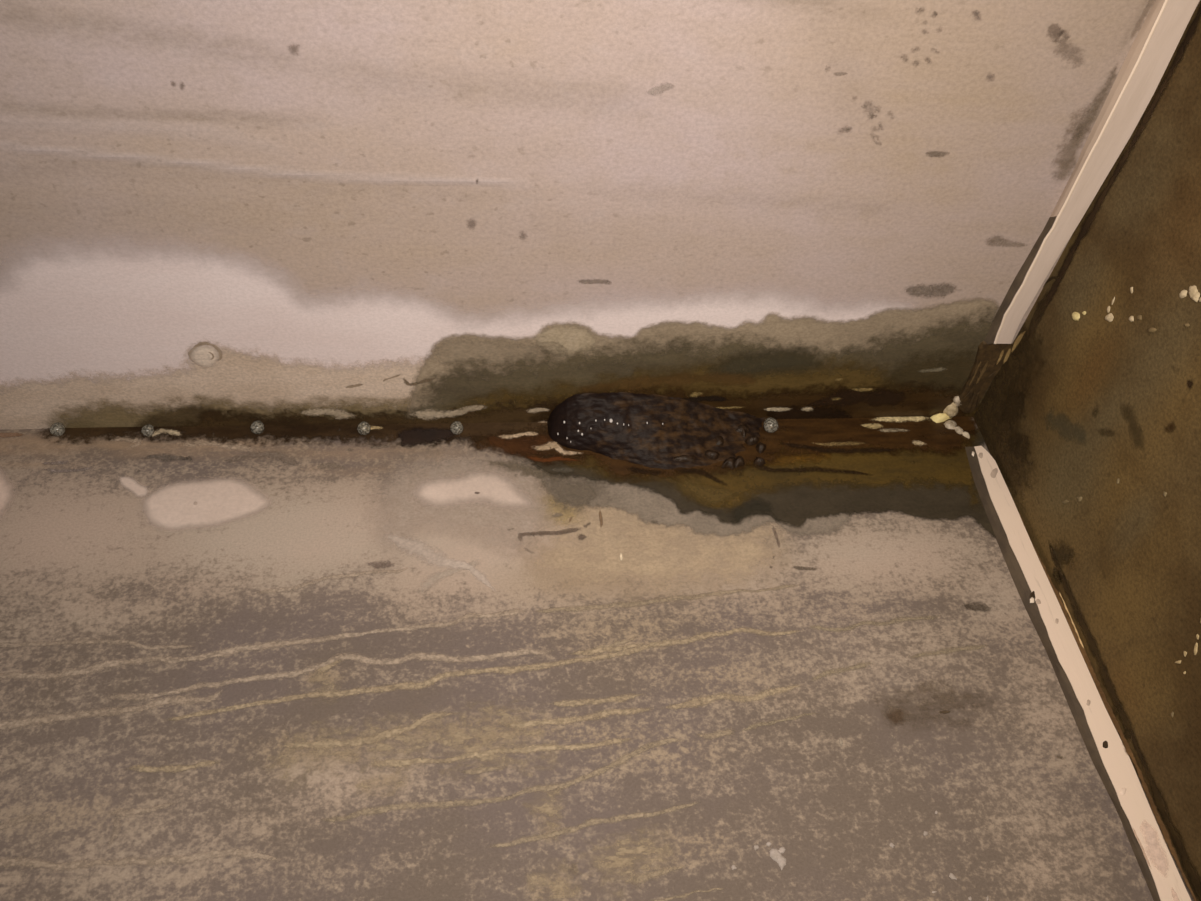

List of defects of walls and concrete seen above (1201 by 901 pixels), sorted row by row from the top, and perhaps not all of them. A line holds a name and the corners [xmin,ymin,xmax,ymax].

leakage [0,5,1201,537]
corrosion [468,374,977,483]
crack [0,527,938,822]
leakage [1049,545,1201,901]